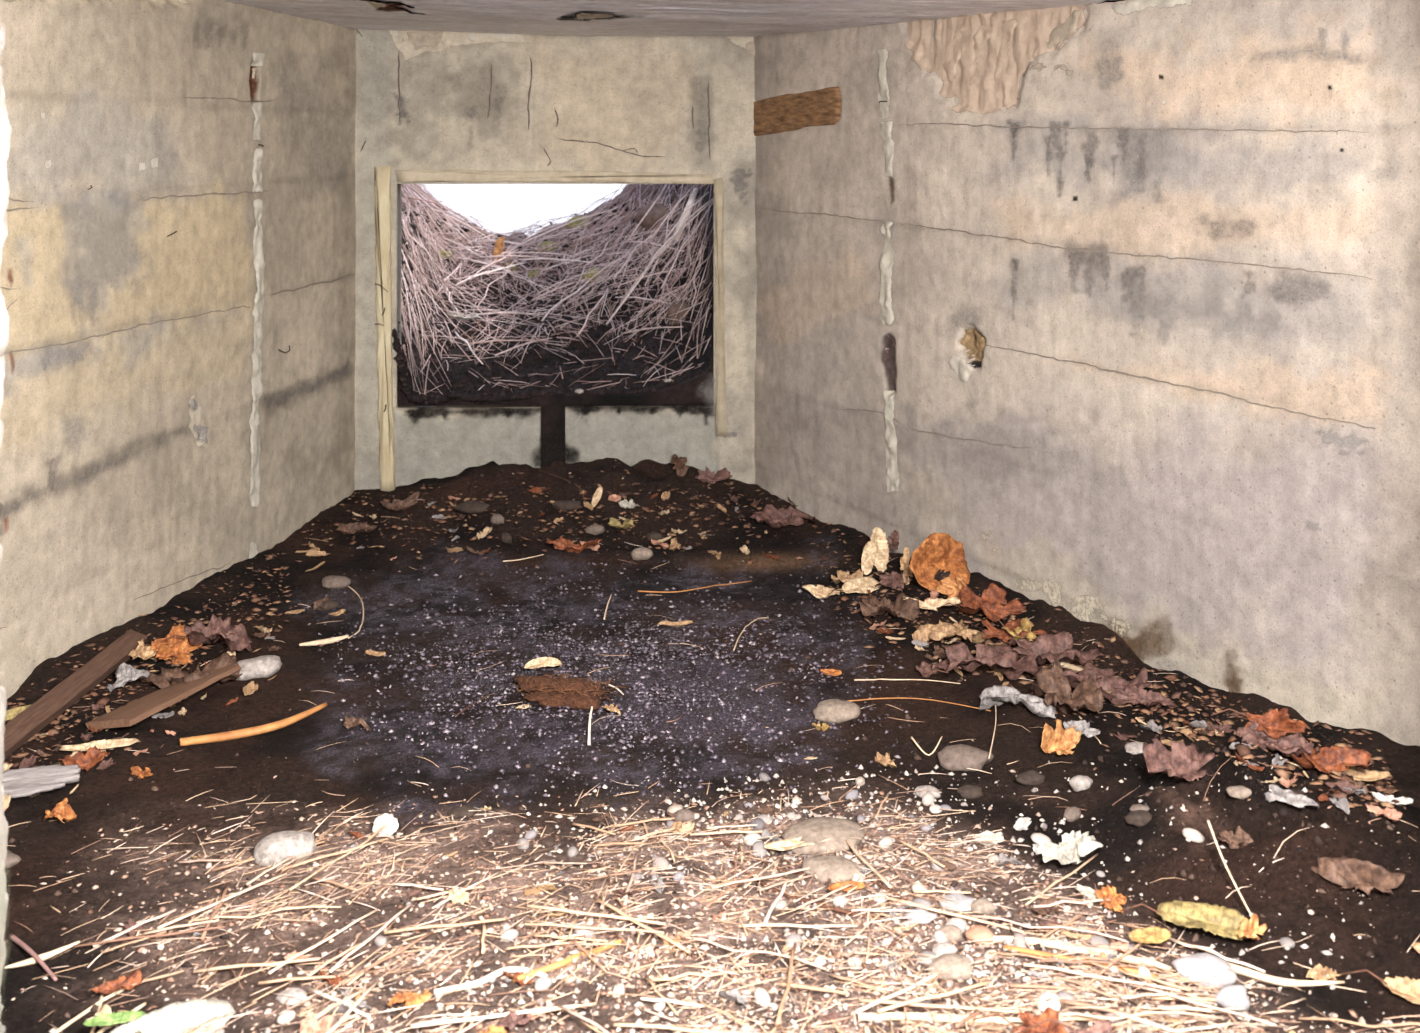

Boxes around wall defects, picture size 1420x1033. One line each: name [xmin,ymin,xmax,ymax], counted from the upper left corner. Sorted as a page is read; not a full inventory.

corrosion [249,66,257,100]
peeling [905,4,1086,115]